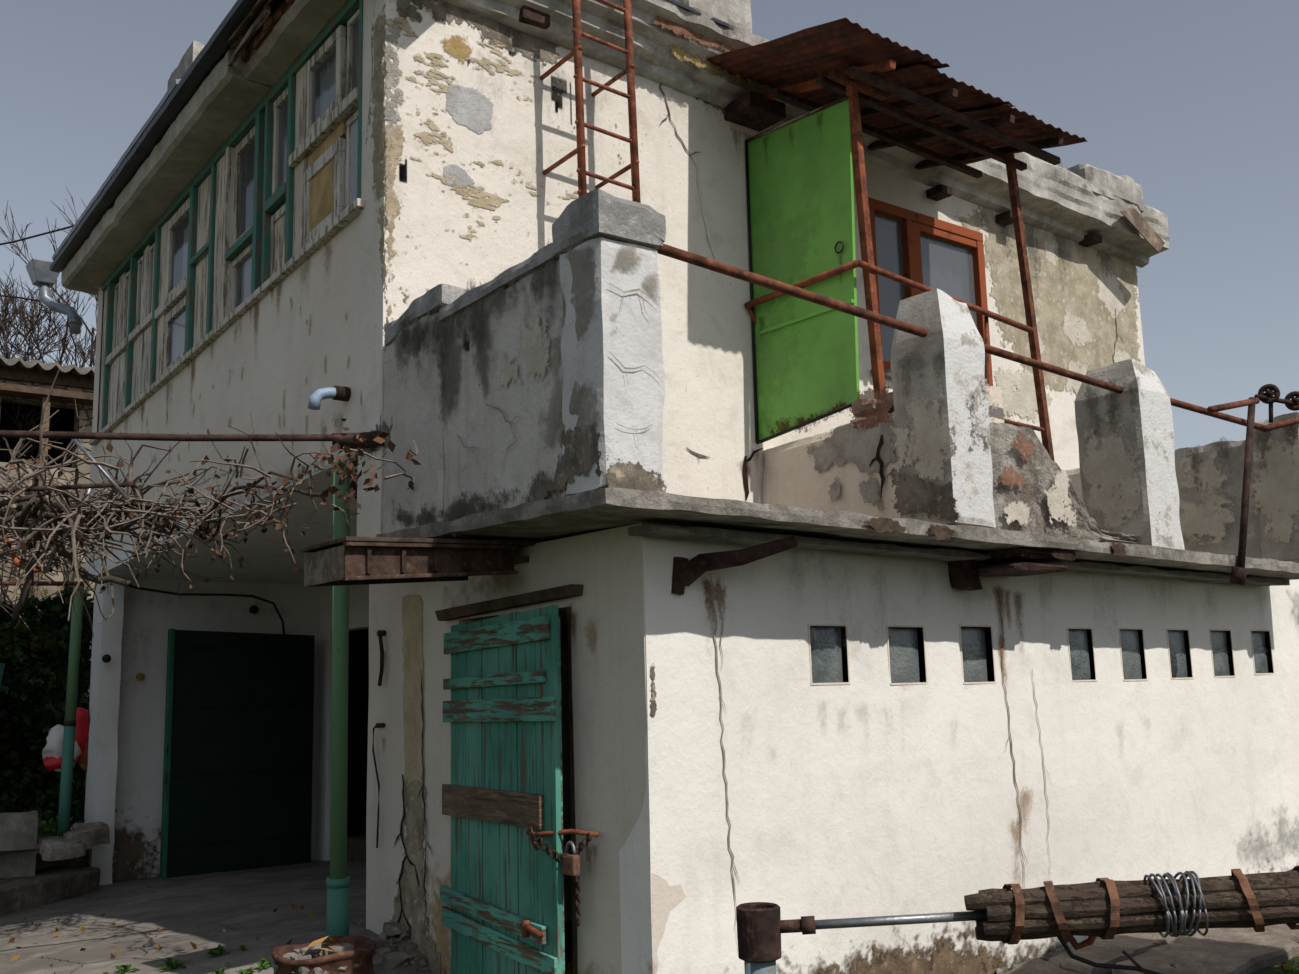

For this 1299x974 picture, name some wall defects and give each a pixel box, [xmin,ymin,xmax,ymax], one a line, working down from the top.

flaking render [358,0,577,364]
crack [659,83,700,170]
leakage [395,243,560,420]
flaking render [530,337,667,501]
crack [869,435,885,498]
flaking render [807,385,959,540]
peeling [957,205,1141,527]
peeling [1179,485,1235,545]
crack [394,670,433,937]
flaking render [390,595,445,974]
crack [710,573,740,940]
crack [999,590,1051,888]